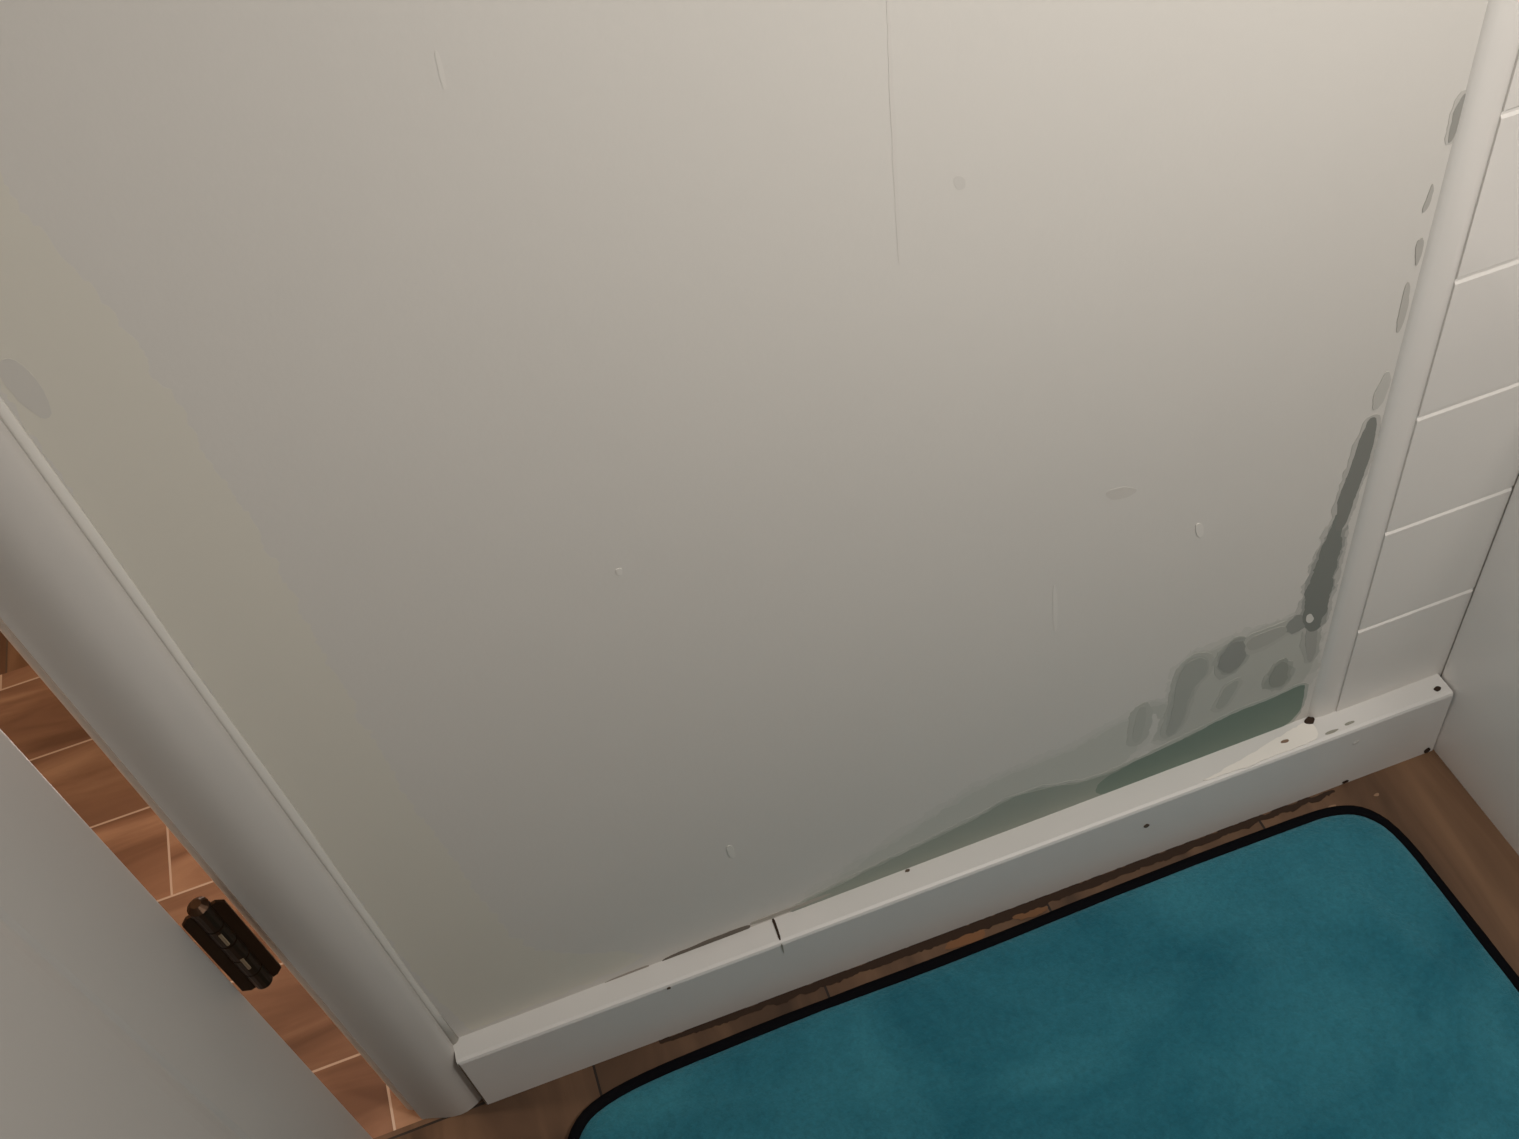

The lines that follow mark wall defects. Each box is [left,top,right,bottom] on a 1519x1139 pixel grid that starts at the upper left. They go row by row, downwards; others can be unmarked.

leakage [803,515,1351,900]